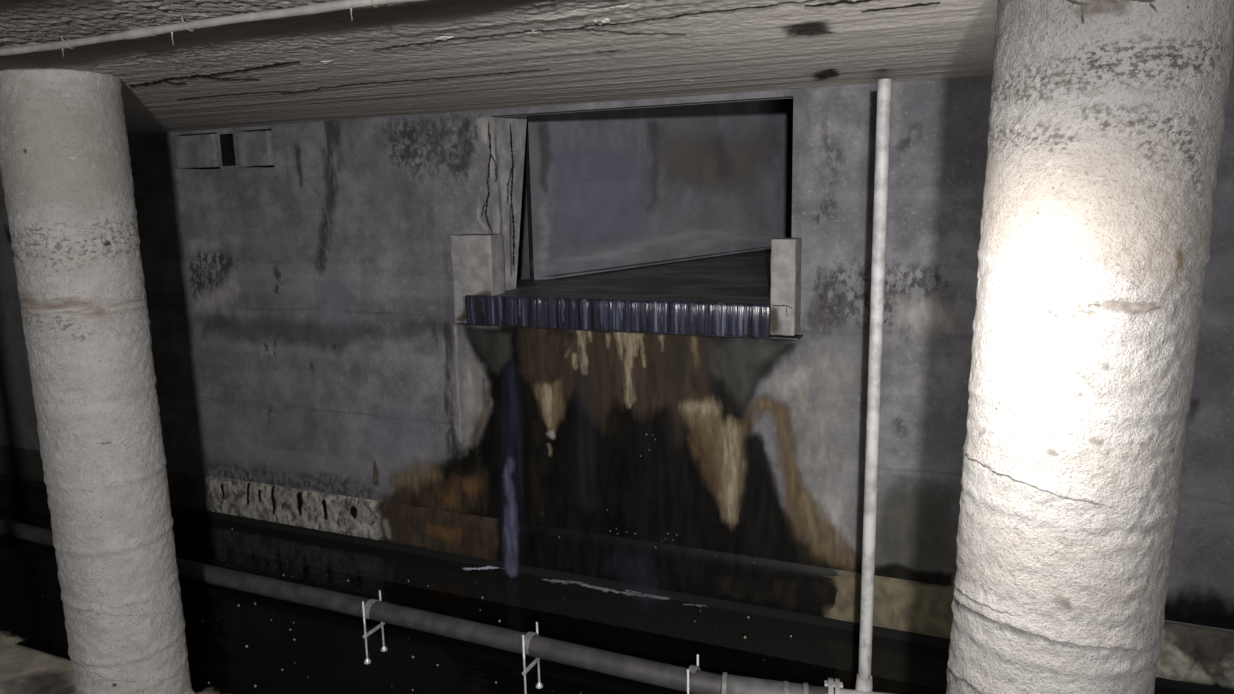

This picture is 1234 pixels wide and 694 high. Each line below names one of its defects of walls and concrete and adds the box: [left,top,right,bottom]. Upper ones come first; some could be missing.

crack [374,0,940,50]
crack [1067,0,1091,24]
crack [1129,0,1157,12]
crack [129,61,550,100]
leakage [389,121,478,174]
leakage [319,120,339,268]
crack [481,122,515,271]
leakage [189,241,239,310]
corrosion [522,327,710,429]
leakage [408,307,954,639]
corrosion [374,462,499,560]
leakage [1164,593,1234,630]